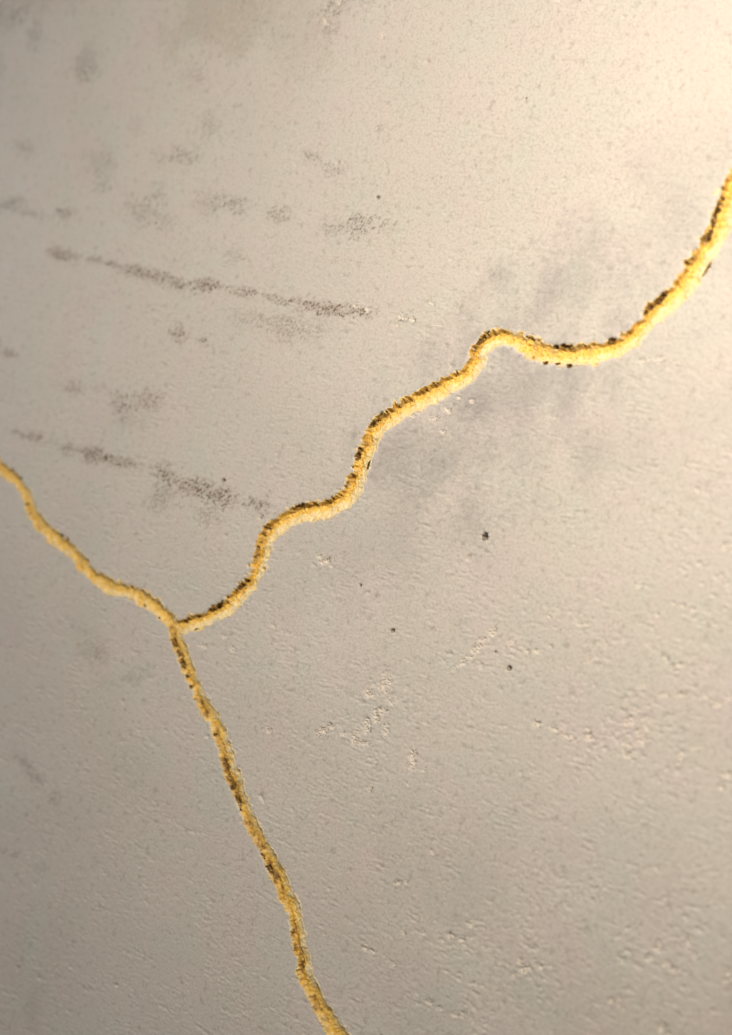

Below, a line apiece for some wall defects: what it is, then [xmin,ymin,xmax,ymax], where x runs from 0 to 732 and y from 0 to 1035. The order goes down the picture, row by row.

crack [0,163,732,635]
crack [167,624,352,1035]